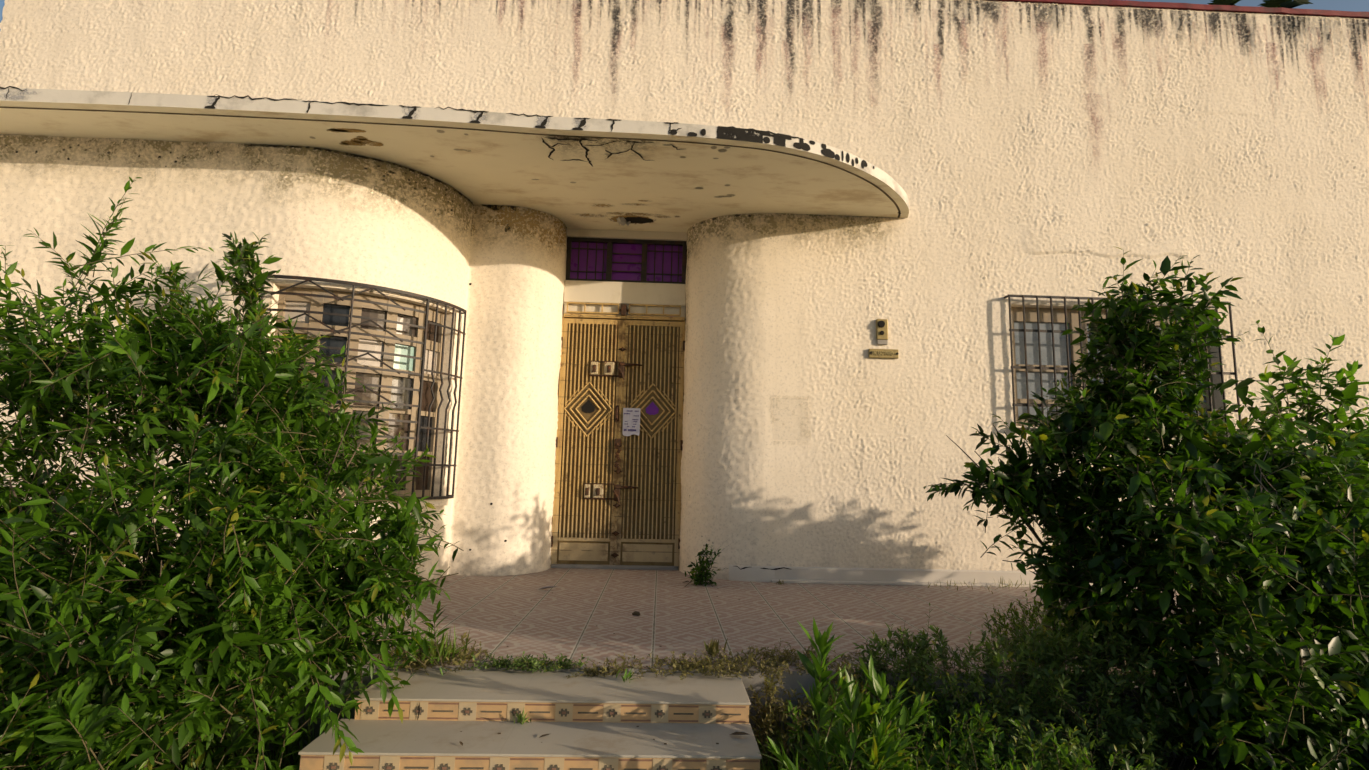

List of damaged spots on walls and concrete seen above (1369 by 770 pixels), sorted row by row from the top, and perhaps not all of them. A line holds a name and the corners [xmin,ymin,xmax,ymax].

leakage [579,0,637,54]
leakage [721,0,766,40]
leakage [786,0,882,68]
leakage [913,0,999,55]
leakage [1019,3,1101,40]
leakage [1116,7,1331,61]
leakage [1350,19,1369,64]
leakage [0,134,222,167]
crack [535,115,681,166]
peeling [670,126,874,169]
leakage [239,143,567,247]
leakage [581,200,881,256]